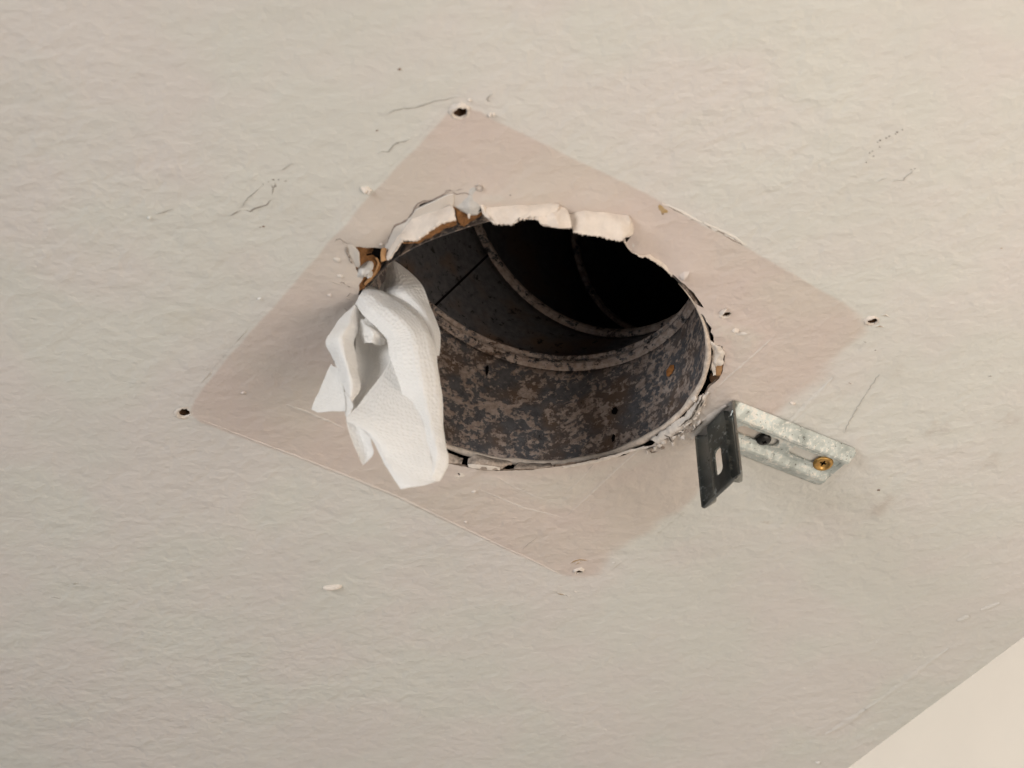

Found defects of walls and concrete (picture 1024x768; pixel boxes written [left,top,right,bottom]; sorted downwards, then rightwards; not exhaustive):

crack [227,163,292,216]
peeling [380,194,690,281]
spalling [562,340,725,468]